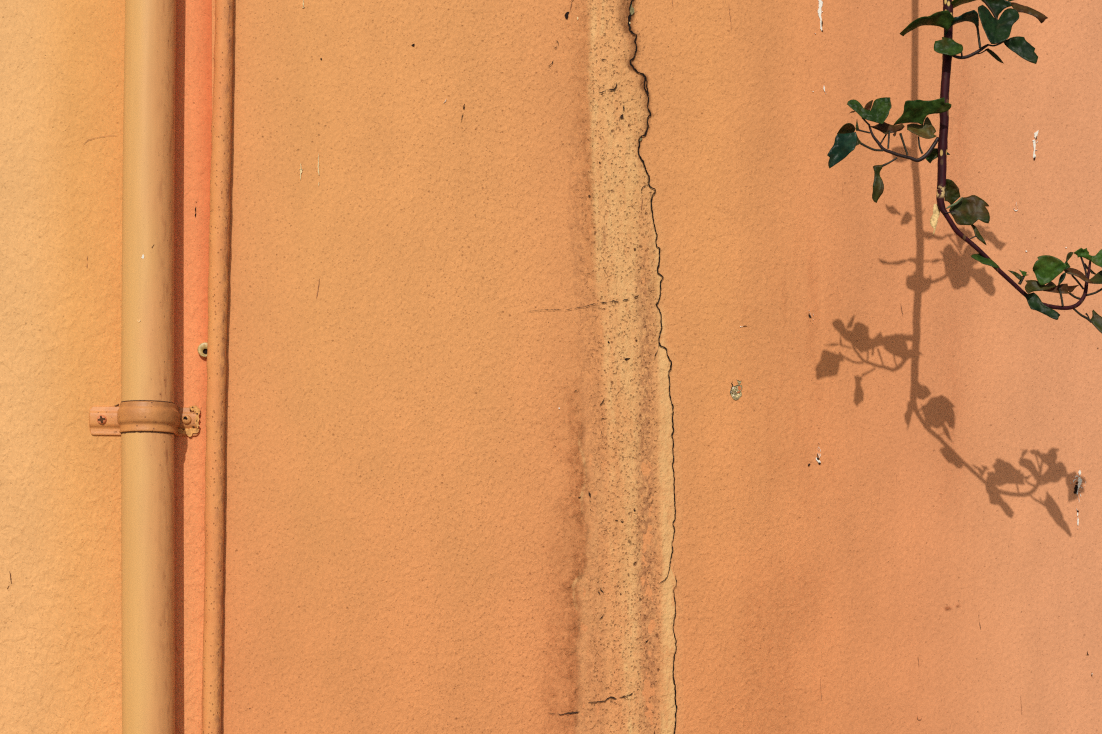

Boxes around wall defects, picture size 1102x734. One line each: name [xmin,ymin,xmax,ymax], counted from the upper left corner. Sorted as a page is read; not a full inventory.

crack [529,0,678,734]
spalling [730,379,742,401]
peeling [1073,470,1086,529]